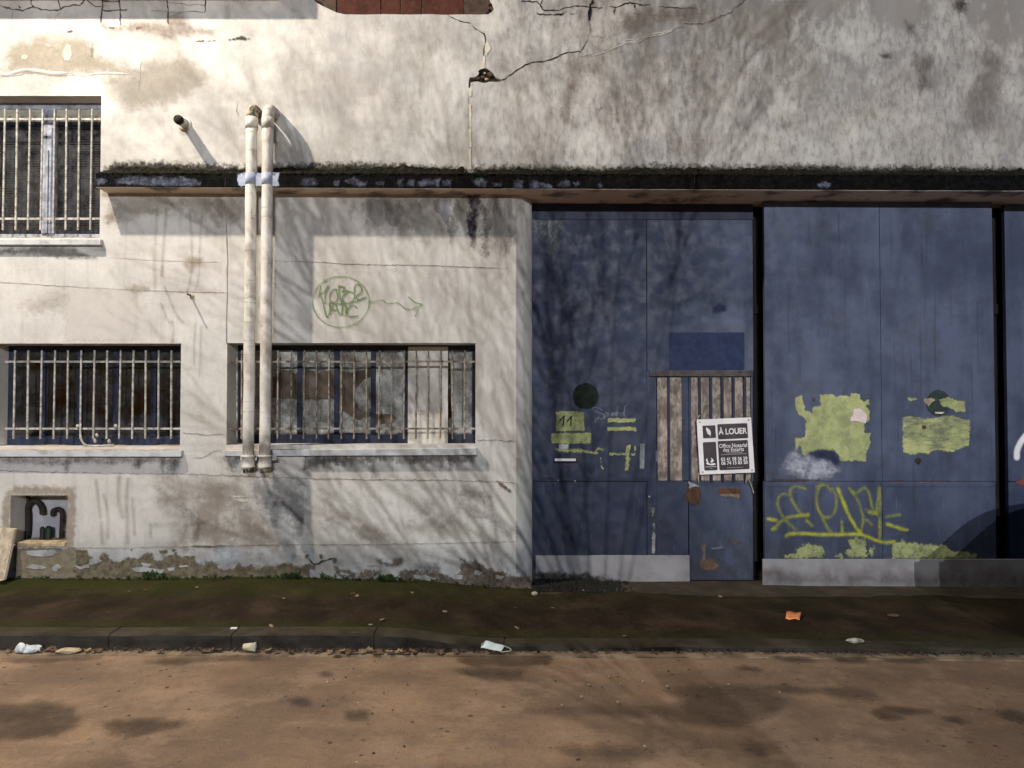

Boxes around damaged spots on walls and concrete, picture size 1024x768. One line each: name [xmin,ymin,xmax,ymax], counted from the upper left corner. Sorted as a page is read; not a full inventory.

crack [0,0,206,25]
leakage [9,39,120,73]
crack [447,14,486,55]
crack [502,0,745,81]
leakage [466,195,512,248]
corrosion [686,487,700,506]
peeling [13,547,315,579]
peeling [334,558,533,589]